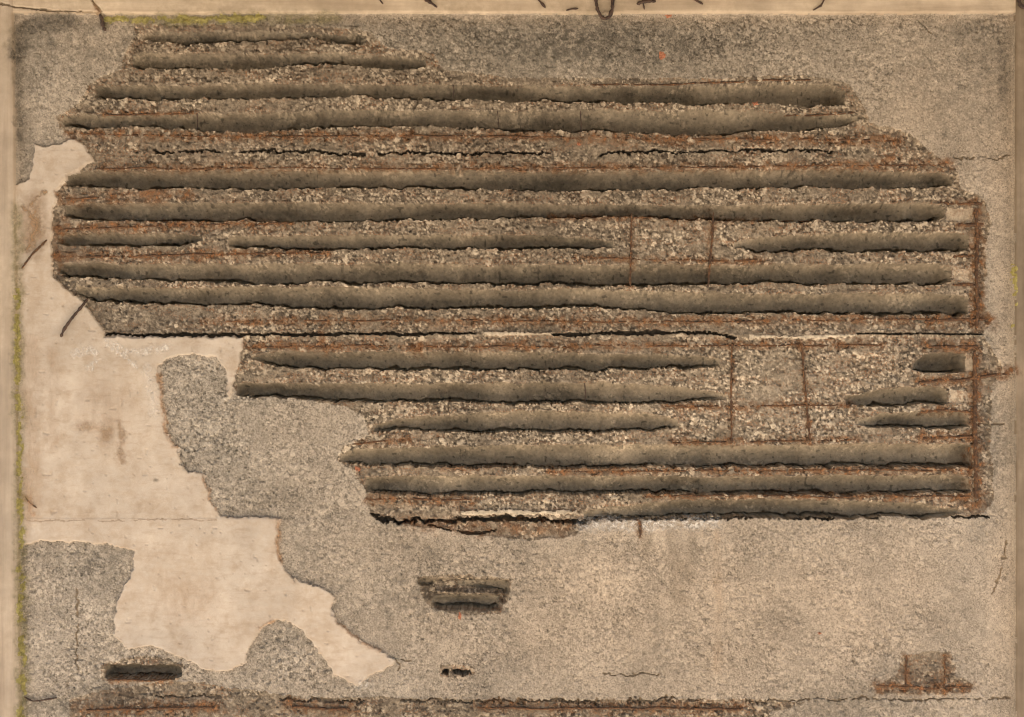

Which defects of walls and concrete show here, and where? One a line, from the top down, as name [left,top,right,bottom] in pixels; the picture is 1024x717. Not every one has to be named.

corrosion [51,218,330,266]
spalling [14,13,1016,337]
corrosion [214,199,1018,511]
corrosion [565,133,953,171]
peeling [20,333,1017,717]